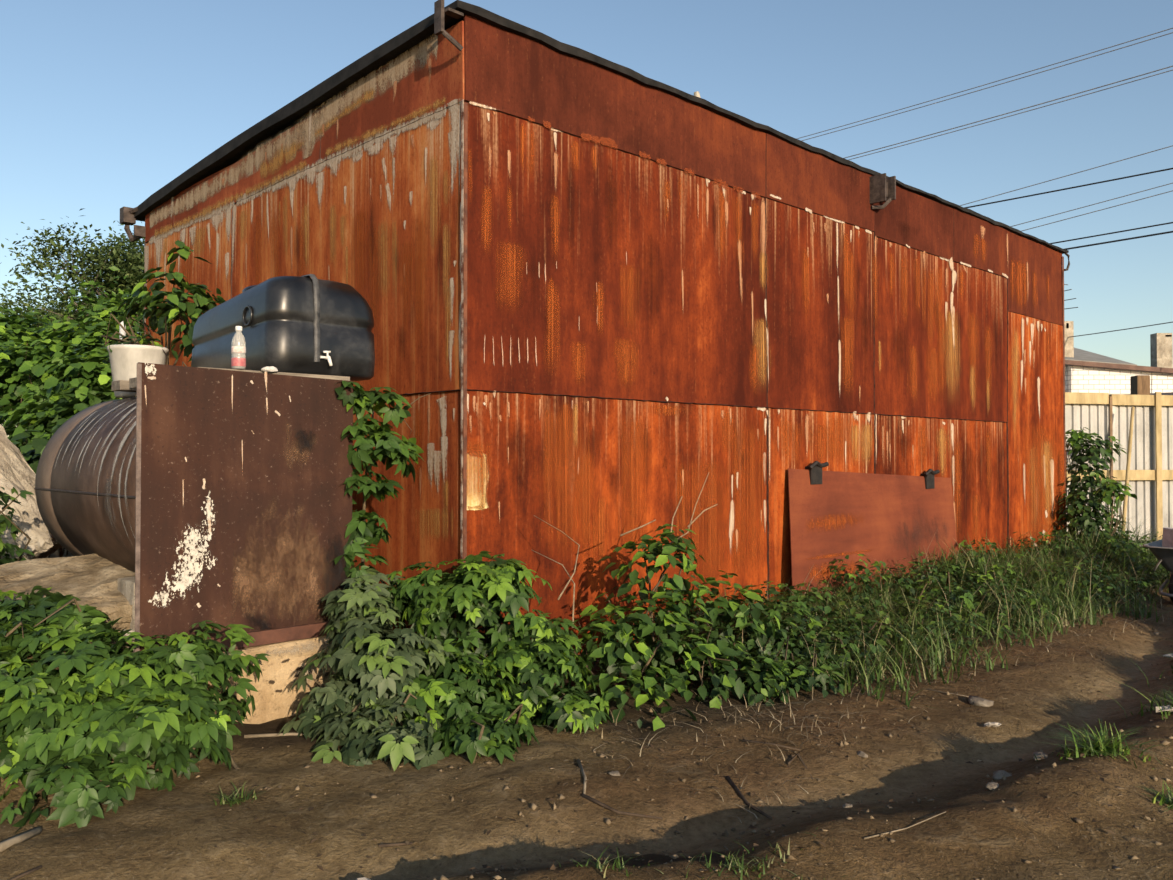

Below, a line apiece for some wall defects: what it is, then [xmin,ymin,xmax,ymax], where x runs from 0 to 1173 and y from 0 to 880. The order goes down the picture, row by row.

rust [331,134,448,325]
rust [508,125,534,174]
rust [697,179,769,385]
rust [813,222,860,396]
rust [875,237,990,401]
rust [1007,234,1049,302]
peeling [148,479,216,608]
rust [234,532,350,630]
rust [416,396,455,533]
rust [677,408,891,573]
rust [939,422,960,526]
rust [1015,334,1063,537]